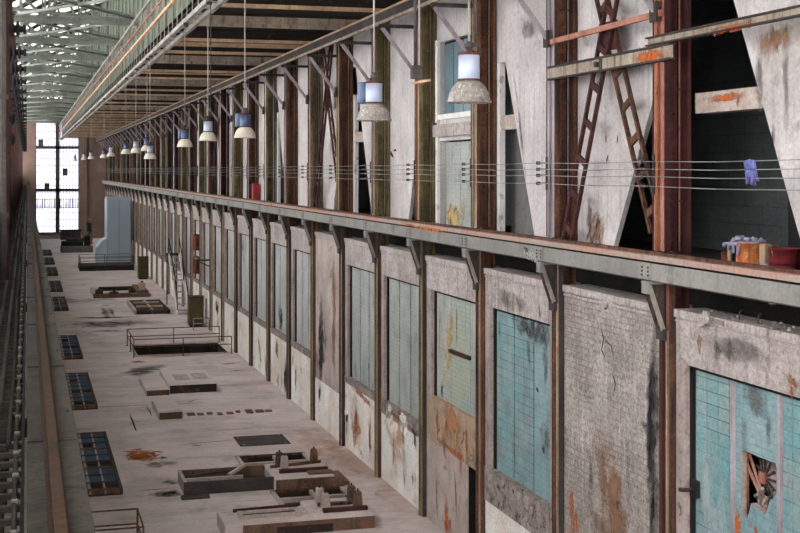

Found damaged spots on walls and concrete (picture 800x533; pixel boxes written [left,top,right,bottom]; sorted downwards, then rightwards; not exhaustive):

corrosion [637,50,662,64]
corrosion [714,93,739,105]
crack [601,330,616,391]
water stain [722,339,758,359]
corrosion [436,409,468,467]
water stain [648,391,658,454]